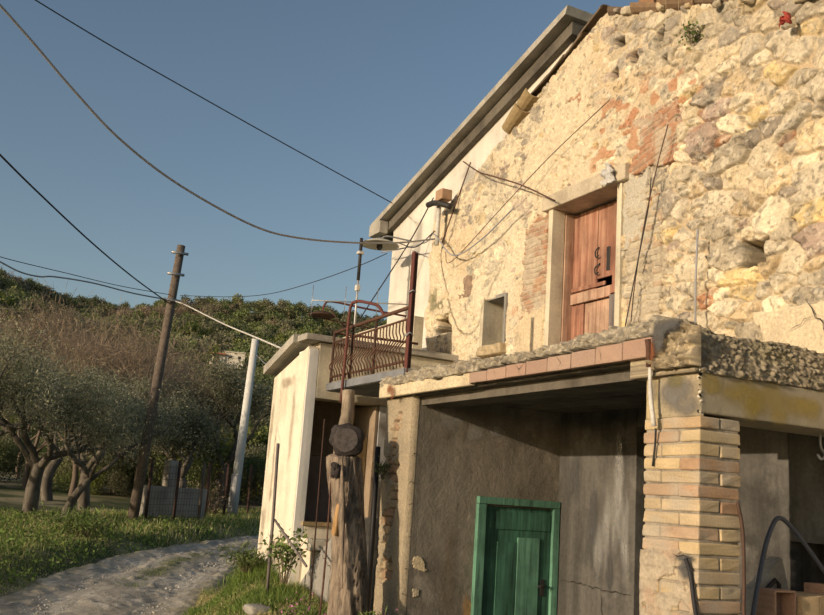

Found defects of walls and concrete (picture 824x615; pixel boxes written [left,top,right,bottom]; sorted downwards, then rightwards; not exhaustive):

spalling [371,396,427,615]
spalling [639,547,694,615]